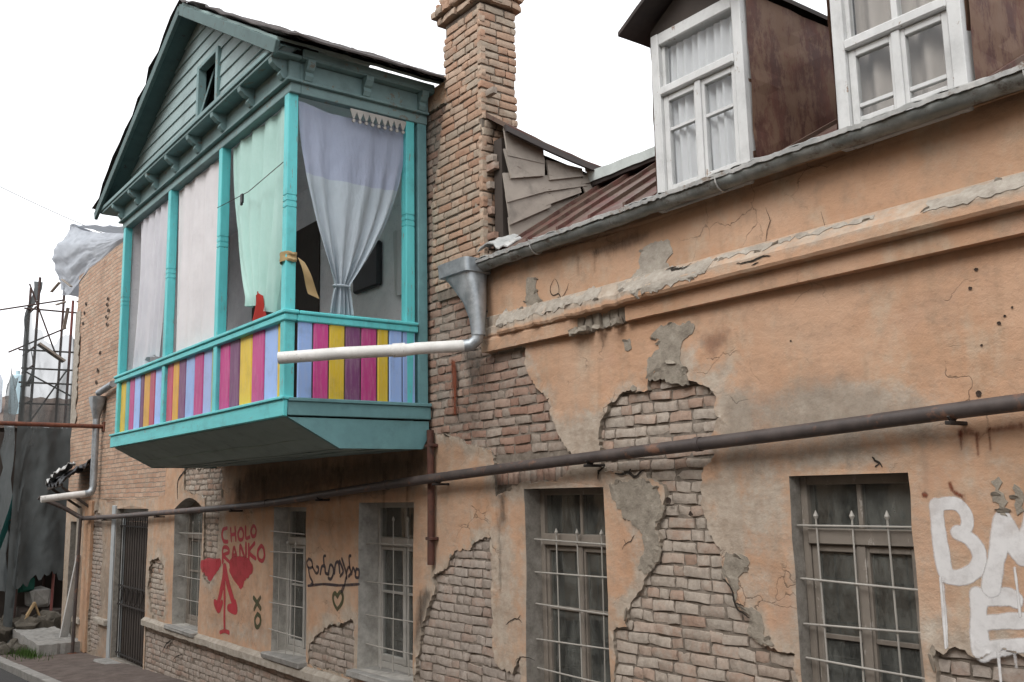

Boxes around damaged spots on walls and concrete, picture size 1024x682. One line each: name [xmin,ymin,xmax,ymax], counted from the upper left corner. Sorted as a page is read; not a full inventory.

flaking render [920,173,1024,213]
crack [736,207,771,265]
flaking render [413,104,571,494]
flaking render [485,277,602,327]
peeling [568,316,624,337]
flaking render [185,467,224,559]
flaking render [602,321,798,682]
flaking render [145,559,310,682]
flaking render [309,620,355,674]
flaking render [413,537,521,682]
flaking render [928,644,1024,682]